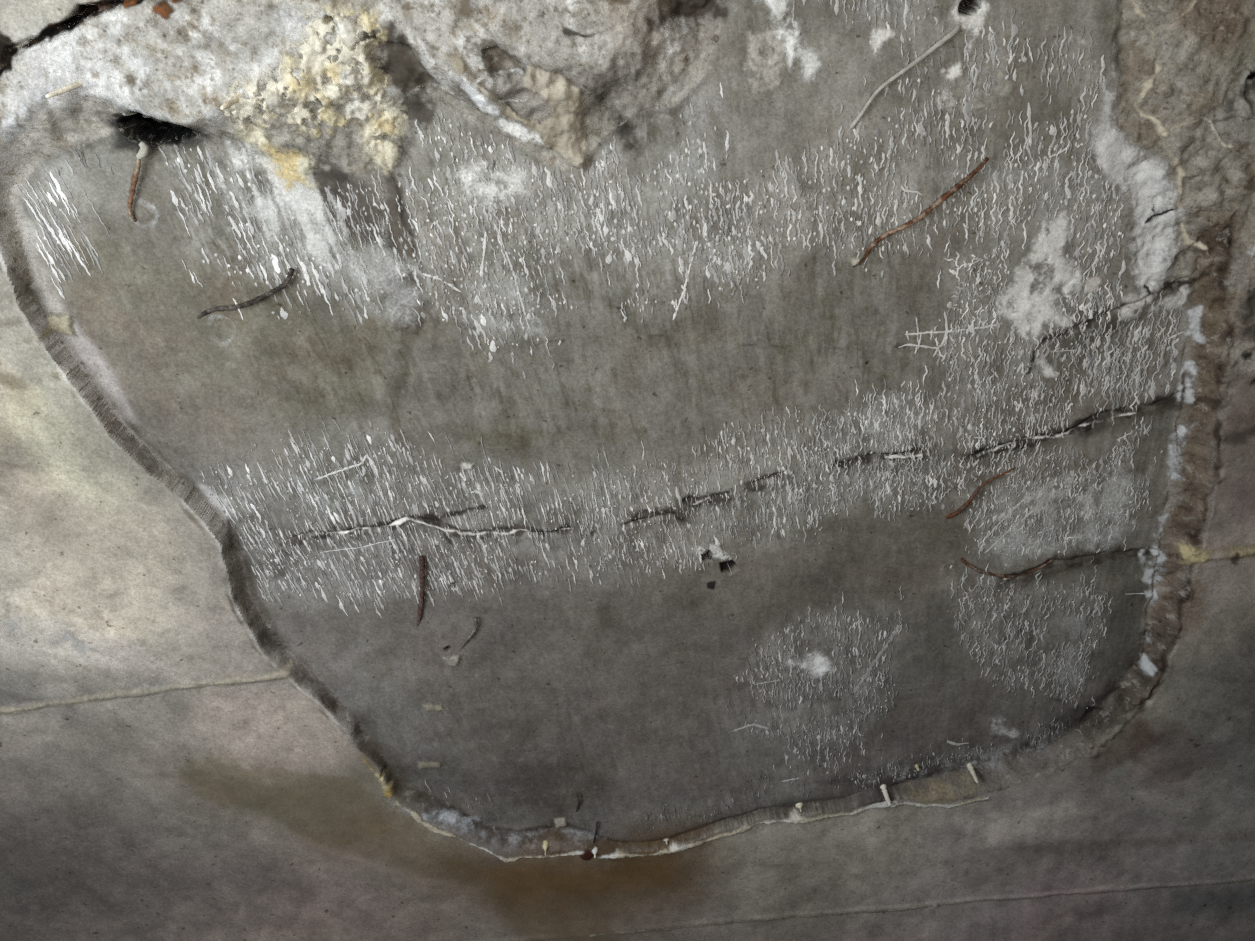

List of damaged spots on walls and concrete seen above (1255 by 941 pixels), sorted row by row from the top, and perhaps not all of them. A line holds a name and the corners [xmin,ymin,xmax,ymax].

leakage [0,35,164,156]
spalling [353,48,588,168]
spalling [487,0,717,157]
leakage [13,145,113,299]
spalling [0,73,271,300]
spalling [1117,0,1255,671]
crack [281,505,570,546]
leakage [159,0,1234,862]
crack [625,472,784,524]
crack [833,444,929,468]
crack [968,387,1186,459]
spalling [221,534,626,857]